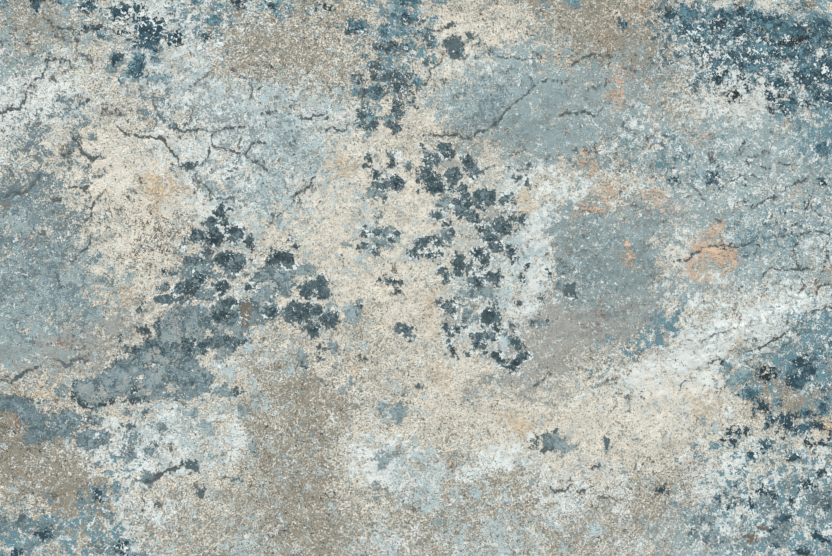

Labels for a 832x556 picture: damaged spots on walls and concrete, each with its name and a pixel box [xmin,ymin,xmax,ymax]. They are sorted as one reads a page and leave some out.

crack [0,17,123,113]
crack [287,111,345,146]
crack [0,132,143,292]
crack [268,176,316,227]
crack [393,20,832,352]
corrosion [684,217,745,285]
crack [800,352,832,381]